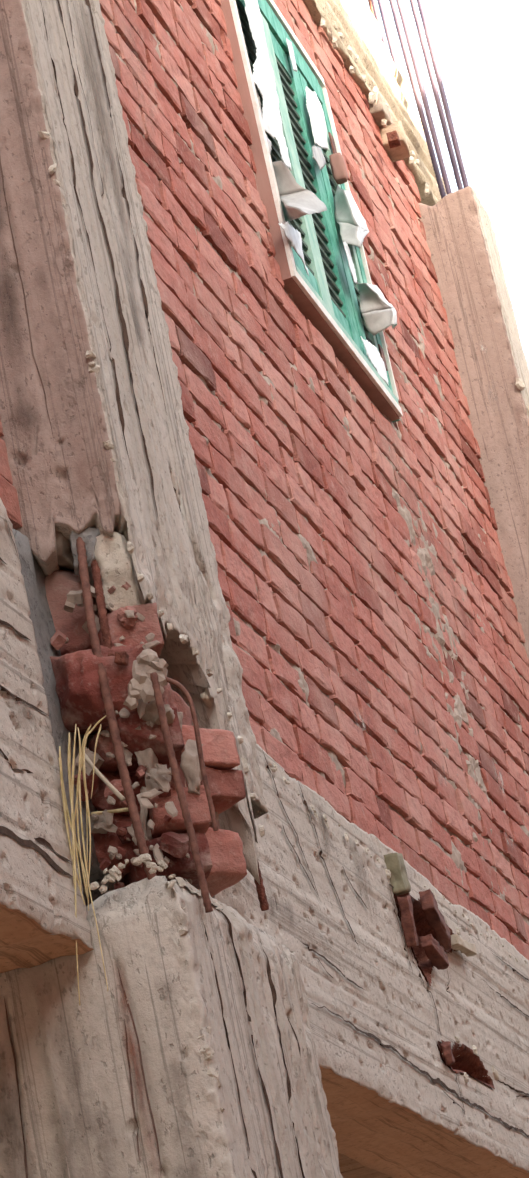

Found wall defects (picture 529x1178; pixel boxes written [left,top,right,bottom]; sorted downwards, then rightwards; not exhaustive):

peeling [320,17,390,127]
spalling [368,0,469,199]
crack [40,0,181,523]
crack [0,749,33,773]
crack [0,685,49,716]
spalling [45,537,269,913]
crack [0,826,73,877]
crack [261,747,450,1035]
spalling [394,885,527,986]
crack [118,970,164,1171]
crack [312,1003,529,1137]
spalling [437,1036,499,1089]